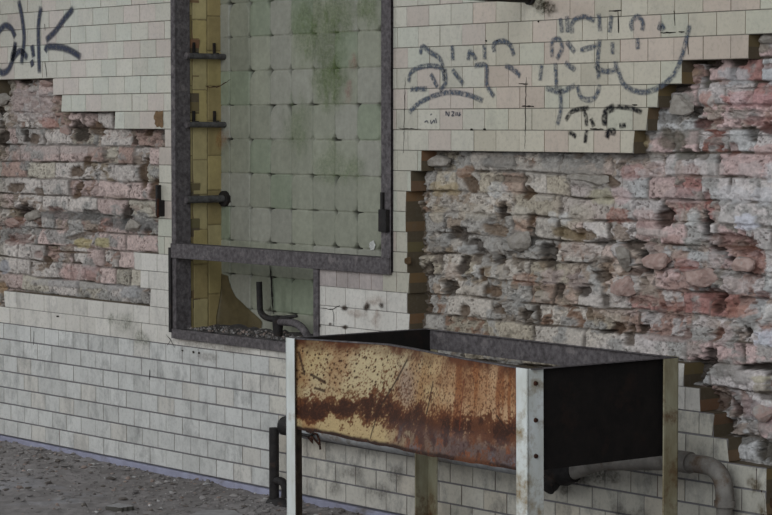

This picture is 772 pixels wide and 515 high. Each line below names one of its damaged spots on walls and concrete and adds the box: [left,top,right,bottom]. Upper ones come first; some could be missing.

spalling [0,79,165,306]
spalling [404,34,772,466]